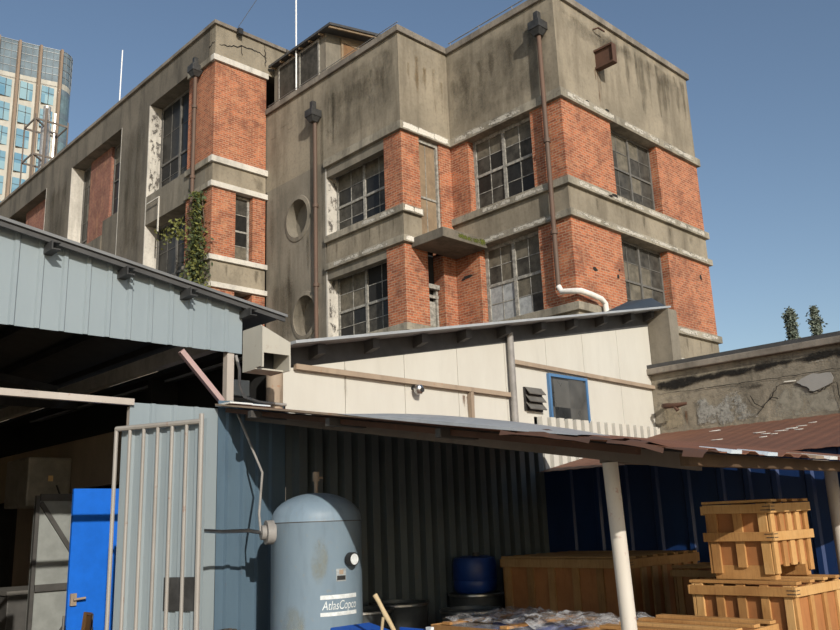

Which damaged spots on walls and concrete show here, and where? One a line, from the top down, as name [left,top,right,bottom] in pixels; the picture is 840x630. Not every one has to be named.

crack [211,42,267,66]
peeling [148,112,162,191]
crack [664,368,840,415]
flaking render [755,372,839,438]
rust [499,429,722,458]